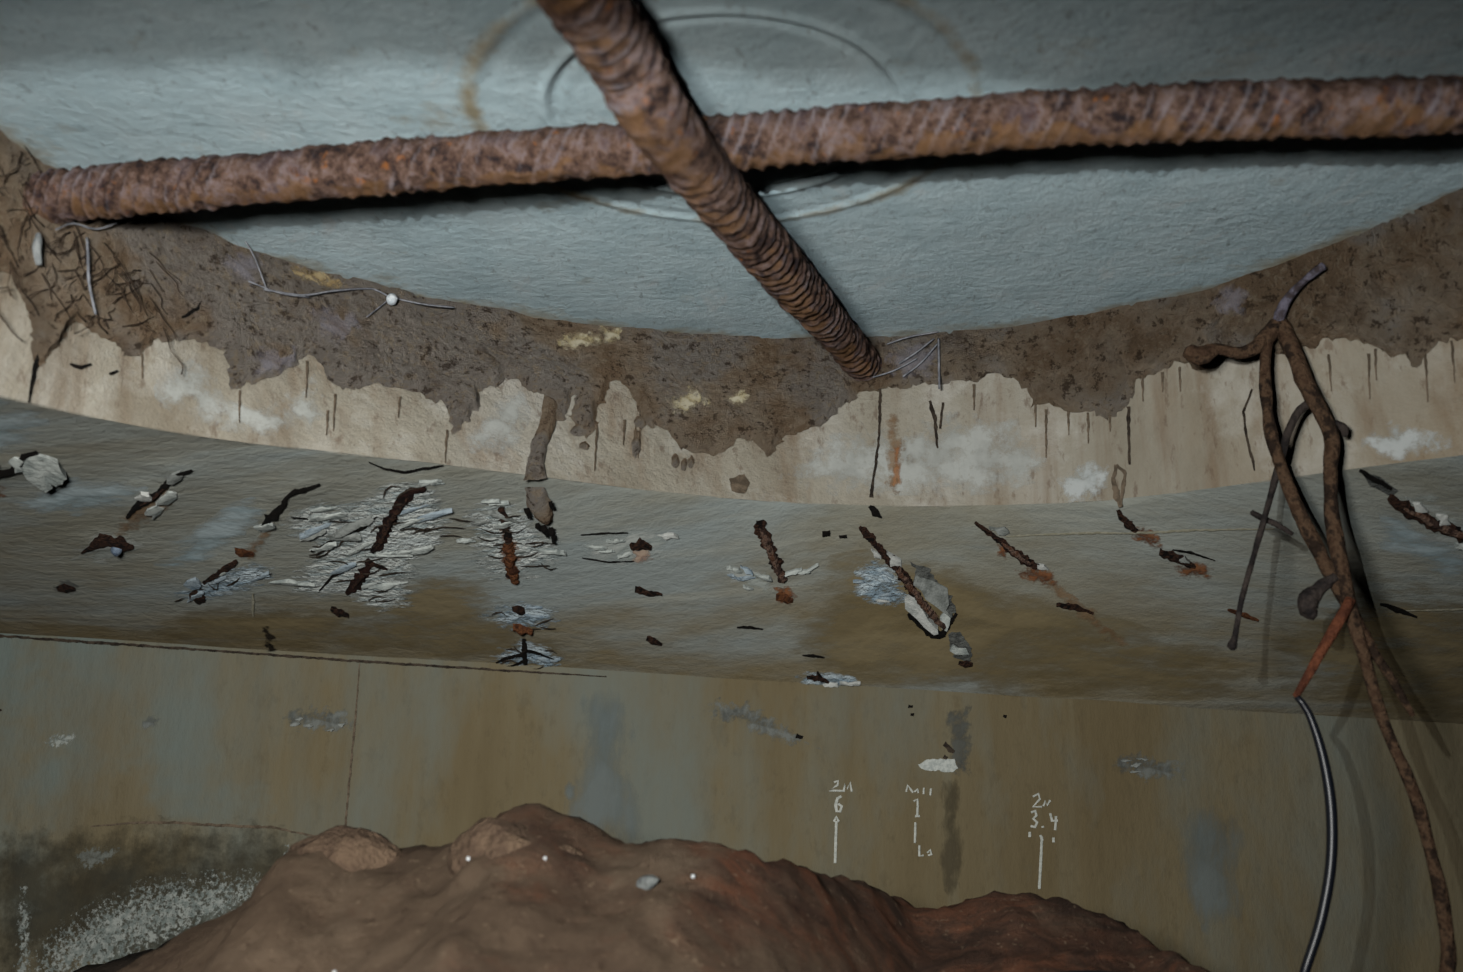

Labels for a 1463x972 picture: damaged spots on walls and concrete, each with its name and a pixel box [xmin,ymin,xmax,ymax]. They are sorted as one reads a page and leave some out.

spalling [0,450,67,497]
spalling [174,478,679,669]
water stain [0,838,288,972]